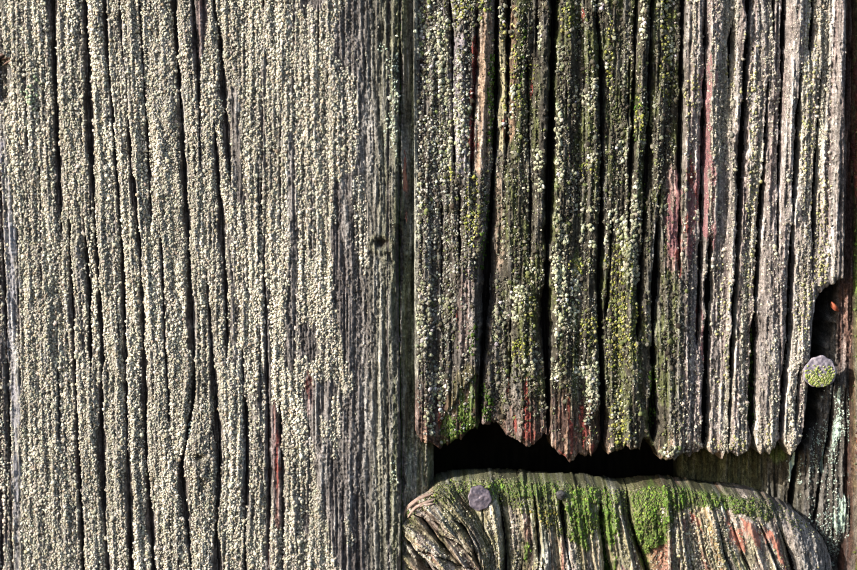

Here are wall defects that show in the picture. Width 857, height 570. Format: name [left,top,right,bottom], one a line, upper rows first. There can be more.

crack [387,0,401,136]
crack [50,0,284,570]
crack [441,0,556,433]
crack [596,0,711,447]
crack [727,0,822,446]
crack [387,171,544,570]
crack [813,382,847,524]
crack [560,500,571,570]
crack [599,504,610,570]
crack [623,479,647,570]
crack [758,521,795,570]